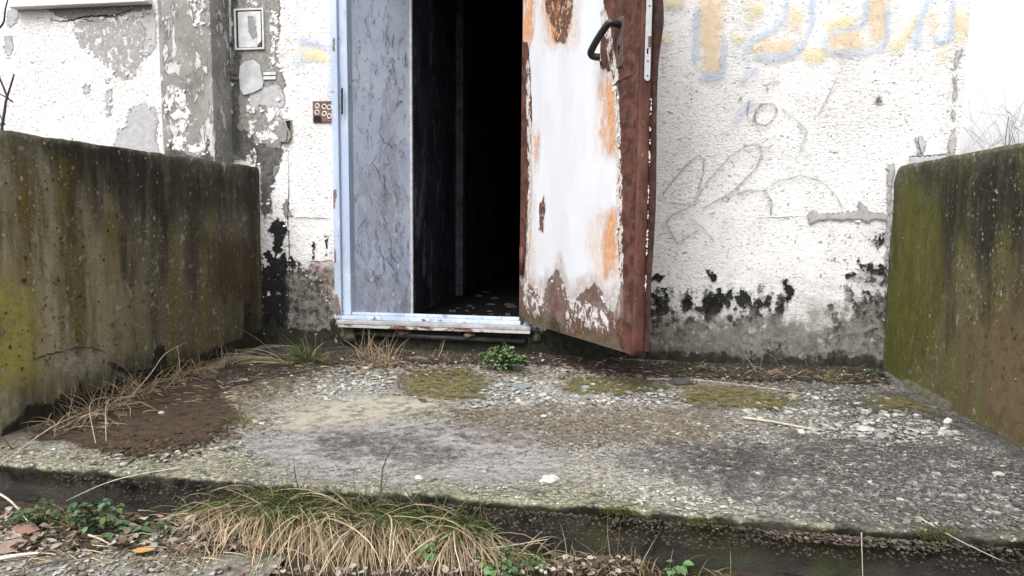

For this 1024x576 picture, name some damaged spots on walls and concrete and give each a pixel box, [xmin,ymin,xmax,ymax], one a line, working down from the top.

peeling [47,5,209,155]
water stain [59,0,284,272]
peeling [190,0,205,26]
flaking render [230,0,341,335]
corrosion [523,0,534,45]
corrosion [547,2,567,41]
corrosion [521,211,624,339]
corrosion [601,83,615,150]
water stain [943,161,1020,264]
water stain [1,260,887,437]